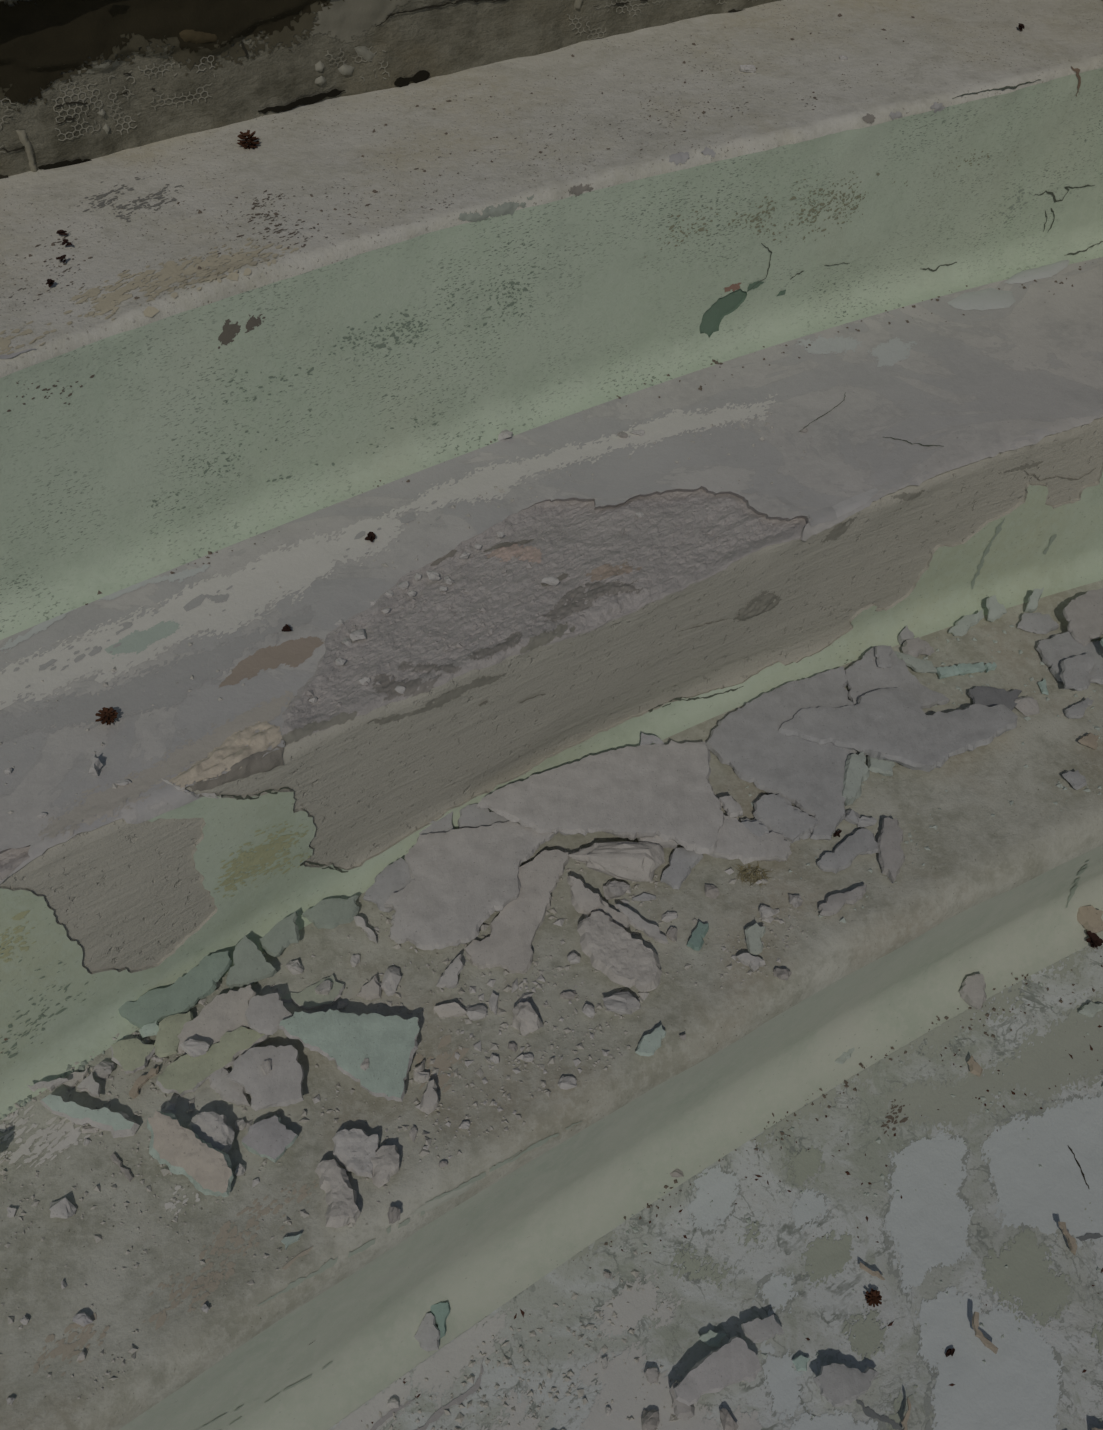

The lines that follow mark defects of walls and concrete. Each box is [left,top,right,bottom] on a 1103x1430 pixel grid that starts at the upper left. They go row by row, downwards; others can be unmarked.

crack [376,0,506,27]
peeling [700,281,764,337]
peeling [161,417,1103,989]
peeling [0,818,218,974]
peeling [110,911,420,1197]
peeling [635,1024,666,1056]
peeling [63,1067,101,1098]